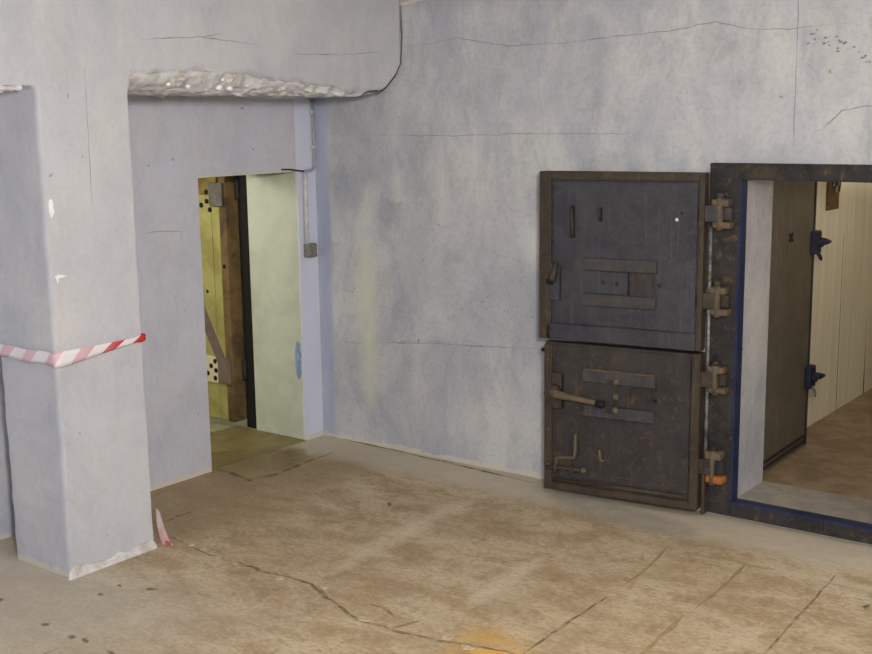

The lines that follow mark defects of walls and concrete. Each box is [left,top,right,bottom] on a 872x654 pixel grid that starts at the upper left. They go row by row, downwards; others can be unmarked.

spalling [0,84,22,93]
spalling [127,70,356,98]
crack [301,0,843,147]
crack [163,509,515,654]